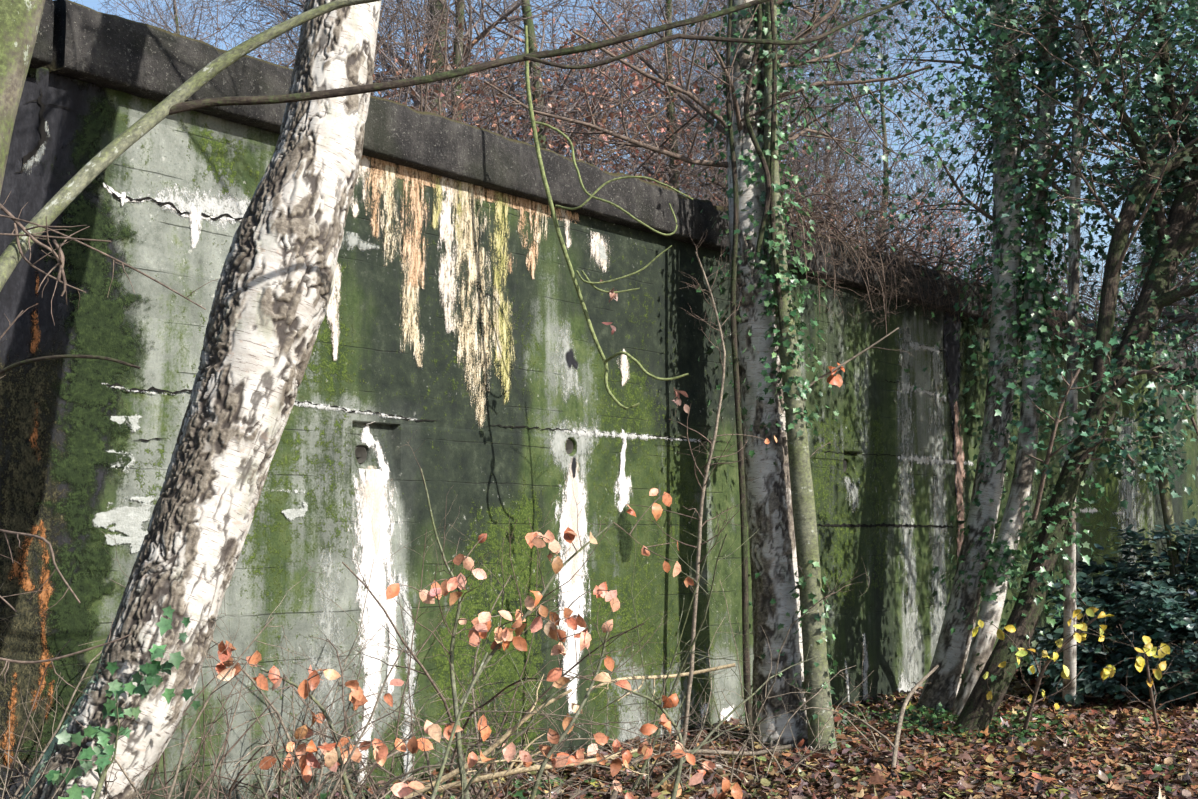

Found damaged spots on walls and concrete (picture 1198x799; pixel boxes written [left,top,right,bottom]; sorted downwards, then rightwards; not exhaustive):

crack [103,182,249,248]
corrosion [30,271,40,354]
leakage [327,262,341,361]
leakage [341,155,580,425]
spalling [106,450,135,471]
spalling [92,496,154,553]
spalling [110,414,142,432]
leakage [550,421,597,479]
leakage [894,311,982,688]
corrosion [0,519,54,768]